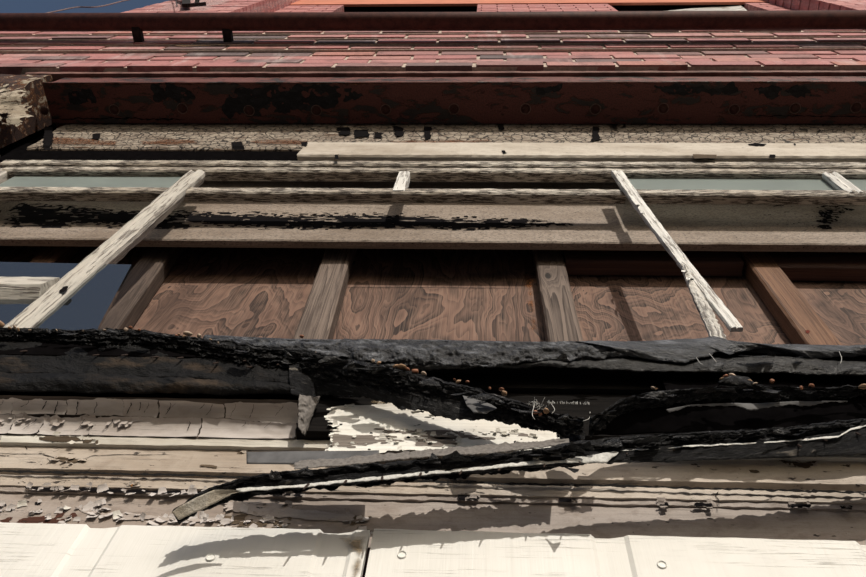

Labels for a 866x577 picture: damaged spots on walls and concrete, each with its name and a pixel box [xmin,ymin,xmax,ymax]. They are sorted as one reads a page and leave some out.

peeling [0,84,32,127]
peeling [0,203,140,229]
peeling [154,210,573,231]
peeling [0,398,299,445]
peeling [324,401,559,453]
peeling [778,458,817,468]
peeling [0,480,216,524]
peeling [217,504,292,528]